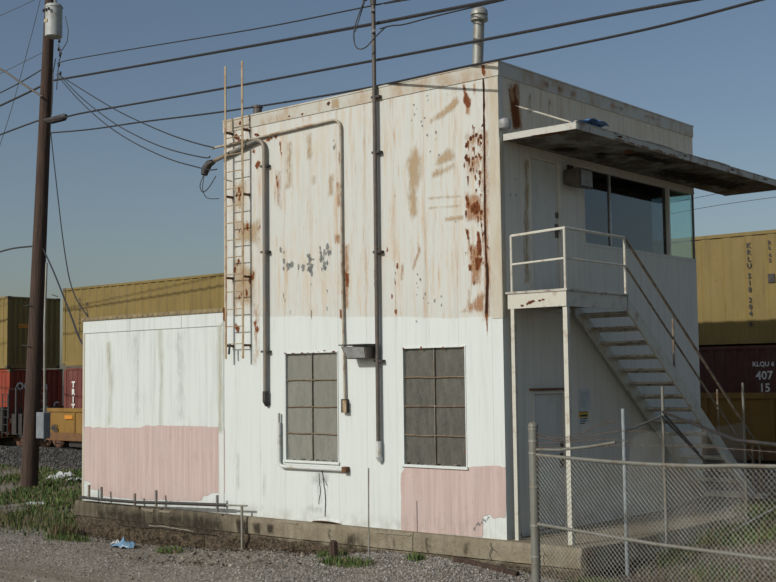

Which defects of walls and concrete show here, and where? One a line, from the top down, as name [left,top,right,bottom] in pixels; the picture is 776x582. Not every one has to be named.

rust [436,85,475,118]
rust [509,84,521,129]
rust [464,133,483,174]
rust [409,151,419,215]
rust [446,195,483,221]
rust [238,222,260,240]
rust [234,259,254,301]
peeling [279,243,331,276]
rust [465,229,483,283]
rust [469,296,483,311]